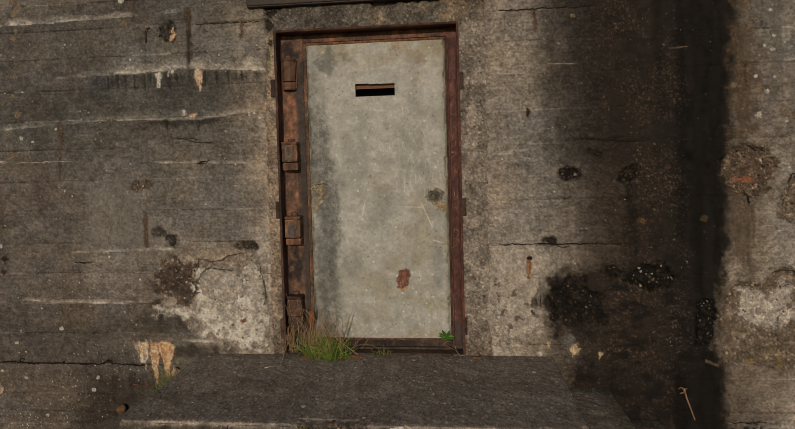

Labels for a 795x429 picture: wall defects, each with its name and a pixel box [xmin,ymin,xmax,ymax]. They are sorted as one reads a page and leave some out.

spalling [157,20,176,42]
spalling [558,165,581,181]
spalling [719,143,781,198]
spalling [428,190,447,211]
damp [537,0,776,429]
spalling [151,227,272,353]
crack [184,253,243,282]
corrosion [396,269,411,292]
spalling [604,264,675,292]
spalling [695,264,795,372]
crack [0,358,153,366]